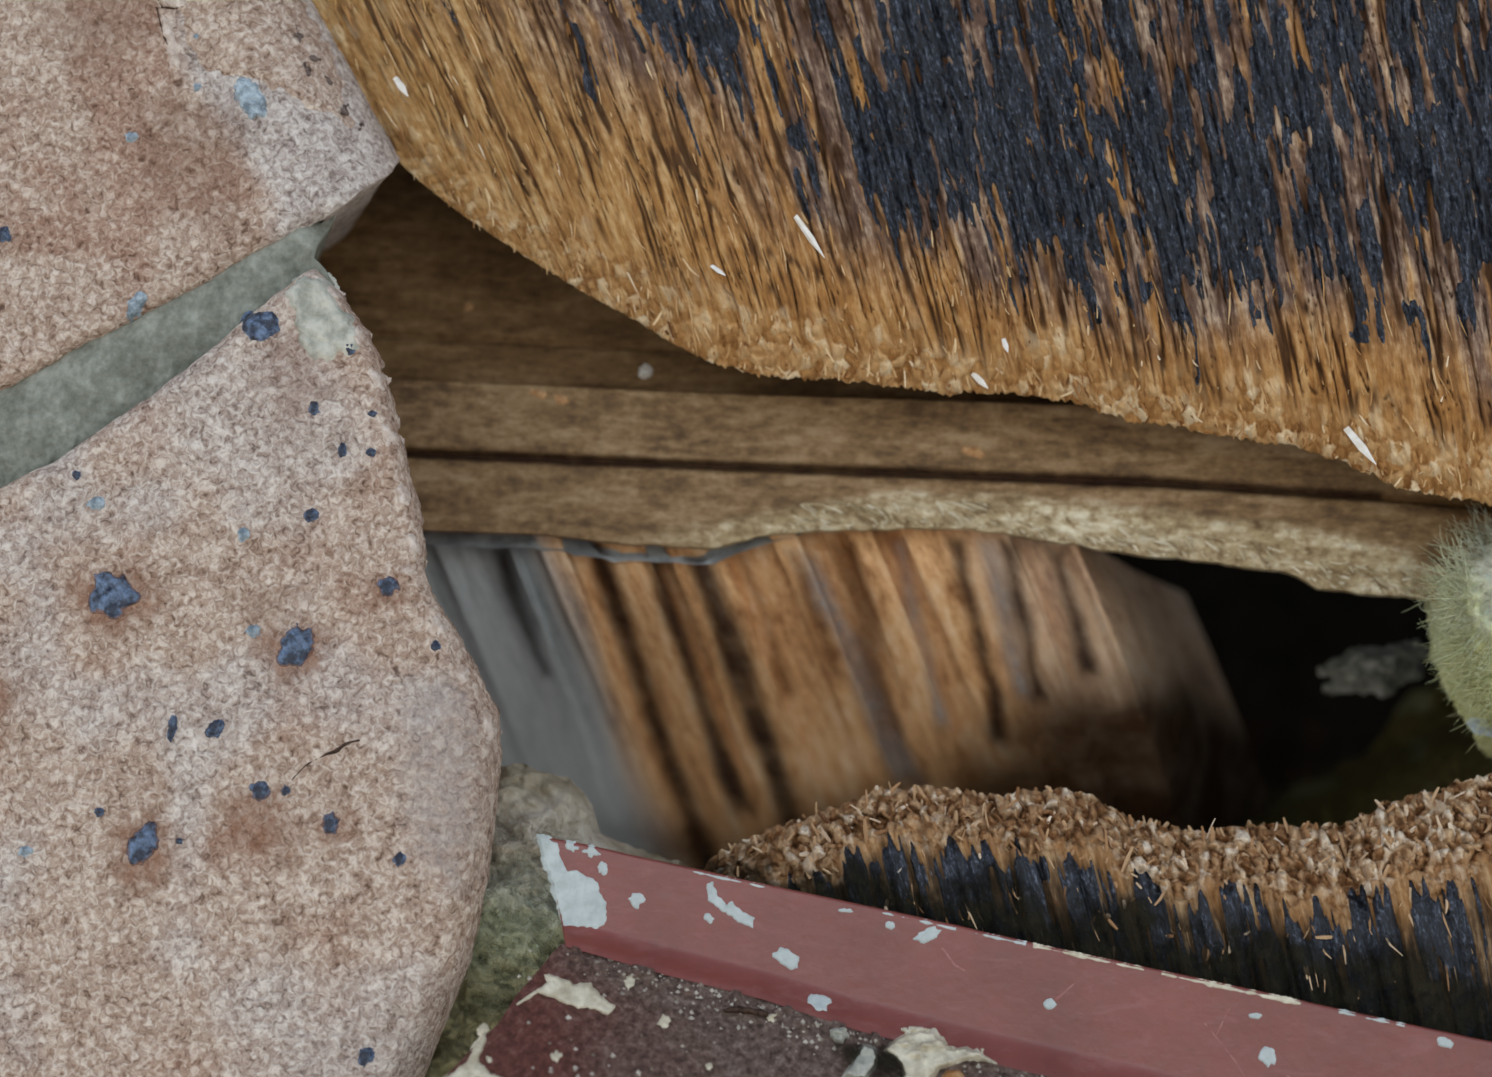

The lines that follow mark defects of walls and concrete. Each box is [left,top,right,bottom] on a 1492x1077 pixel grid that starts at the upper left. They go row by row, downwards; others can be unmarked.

spalling [537,834,608,929]
spalling [628,893,646,909]
spalling [693,871,765,928]
peeling [516,974,616,1015]
spalling [624,976,635,989]
spalling [657,1014,671,1028]
spalling [807,994,832,1011]
peeling [444,1023,499,1077]
peeling [830,1026,1001,1077]